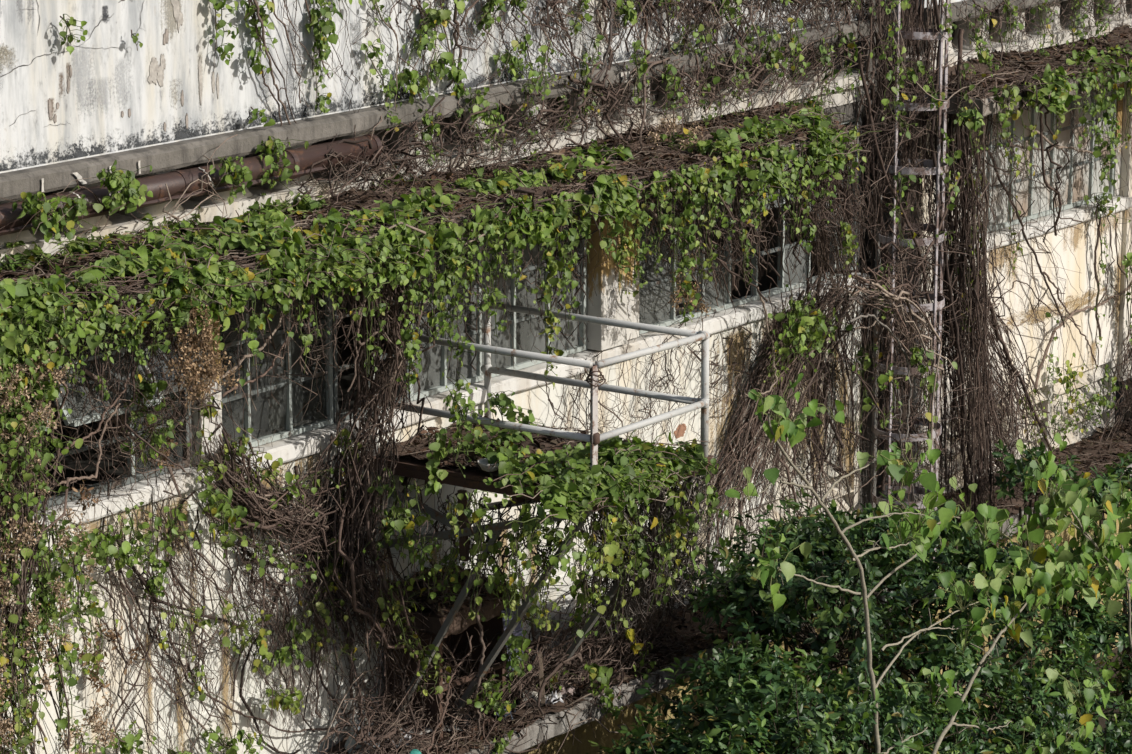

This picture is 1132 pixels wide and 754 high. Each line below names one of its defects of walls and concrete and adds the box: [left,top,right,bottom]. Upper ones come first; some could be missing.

crack [0,0,144,77]
peeling [147,0,184,87]
leakage [165,0,181,38]
peeling [48,65,72,123]
leakage [0,11,869,198]
leakage [1003,287,1106,329]